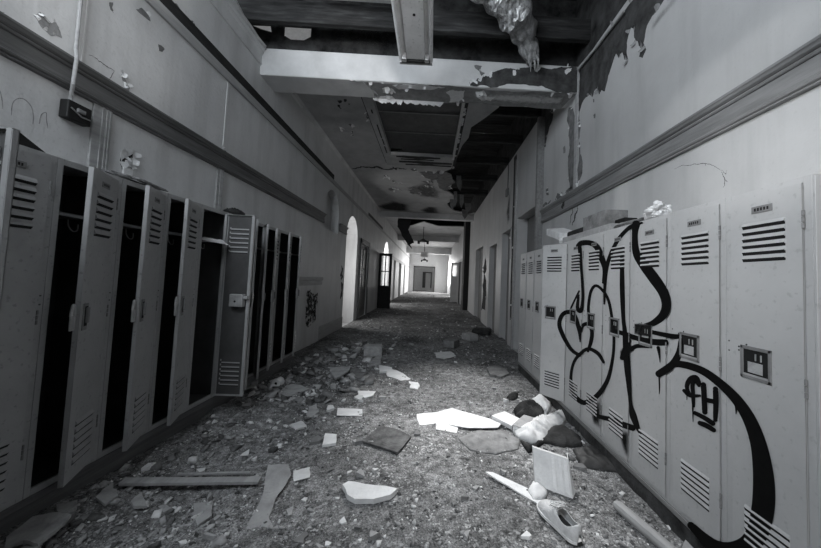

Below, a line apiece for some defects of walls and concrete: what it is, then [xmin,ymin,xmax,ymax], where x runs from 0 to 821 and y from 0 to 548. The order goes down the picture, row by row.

peeling [34,12,62,38]
flaking render [349,0,664,207]